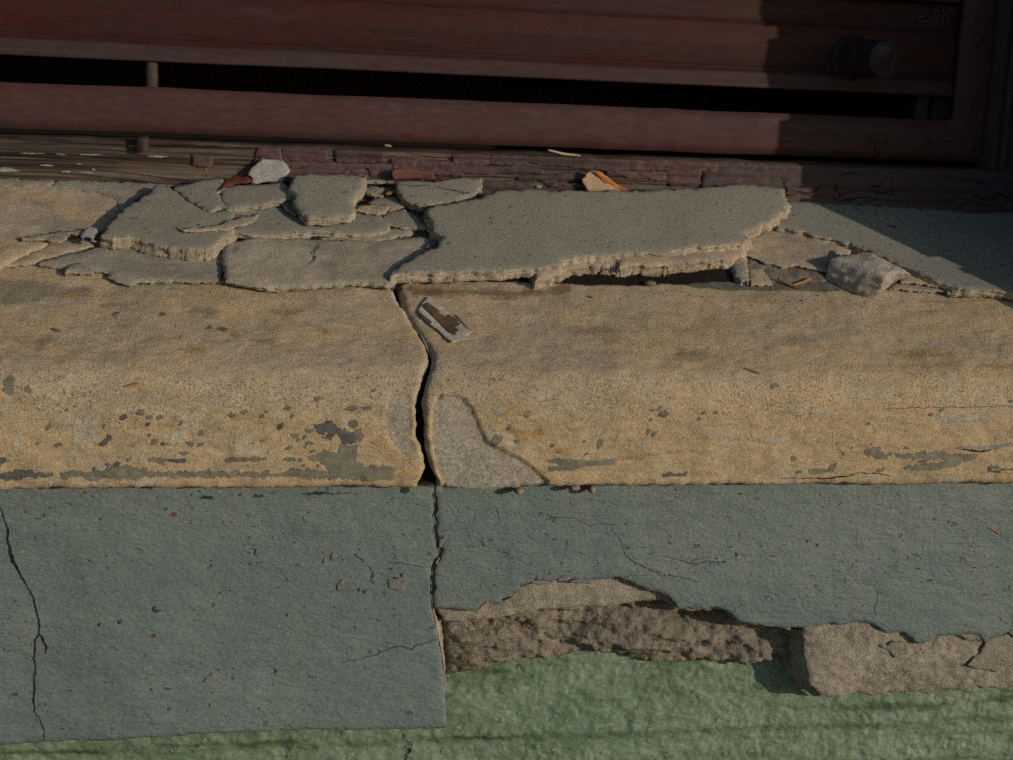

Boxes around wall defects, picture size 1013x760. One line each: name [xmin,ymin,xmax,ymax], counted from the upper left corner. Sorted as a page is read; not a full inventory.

peeling [238,147,1013,216]
crack [393,283,403,301]
spalling [748,268,773,287]
peeling [0,405,395,482]
spalling [386,394,413,455]
crack [355,367,447,609]
spalling [433,396,617,488]
peeling [646,406,670,437]
peeling [791,442,1013,475]
crack [0,508,48,742]
spalling [433,569,1013,728]